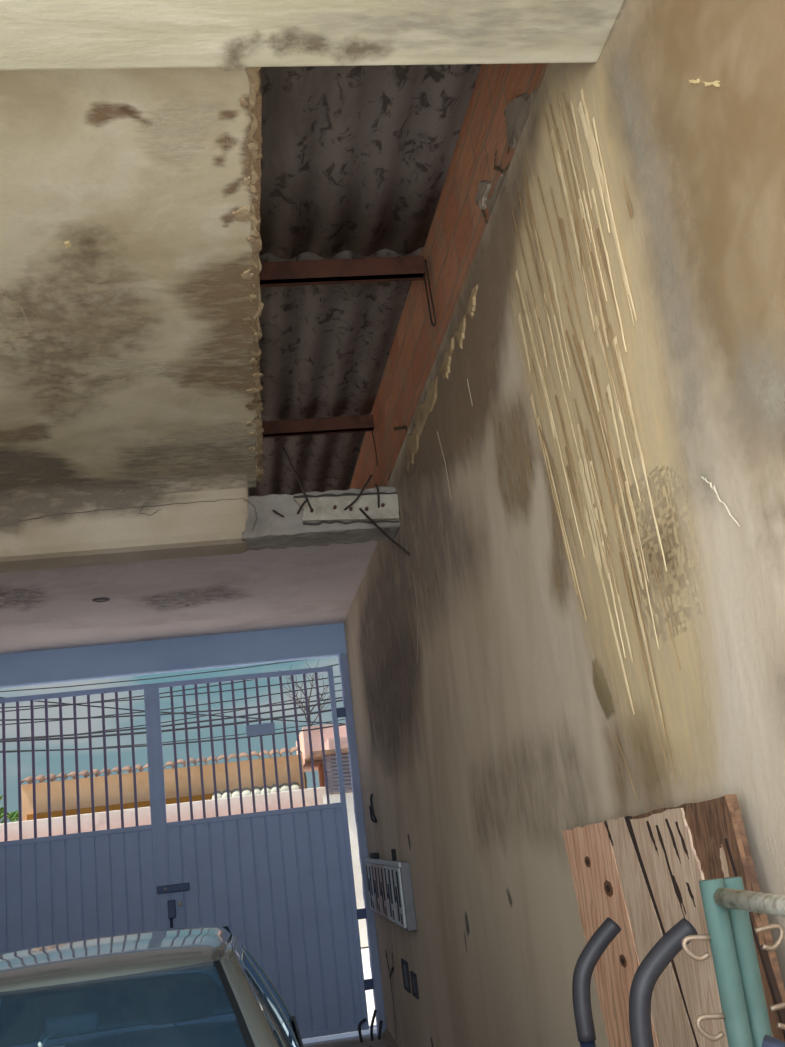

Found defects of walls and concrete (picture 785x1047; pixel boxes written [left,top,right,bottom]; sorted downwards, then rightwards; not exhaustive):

damp [343,42,382,56]
damp [8,252,137,401]
damp [182,258,259,396]
spalling [217,67,265,482]
damp [632,0,785,422]
damp [0,426,165,528]
spalling [293,492,401,525]
damp [360,49,707,801]